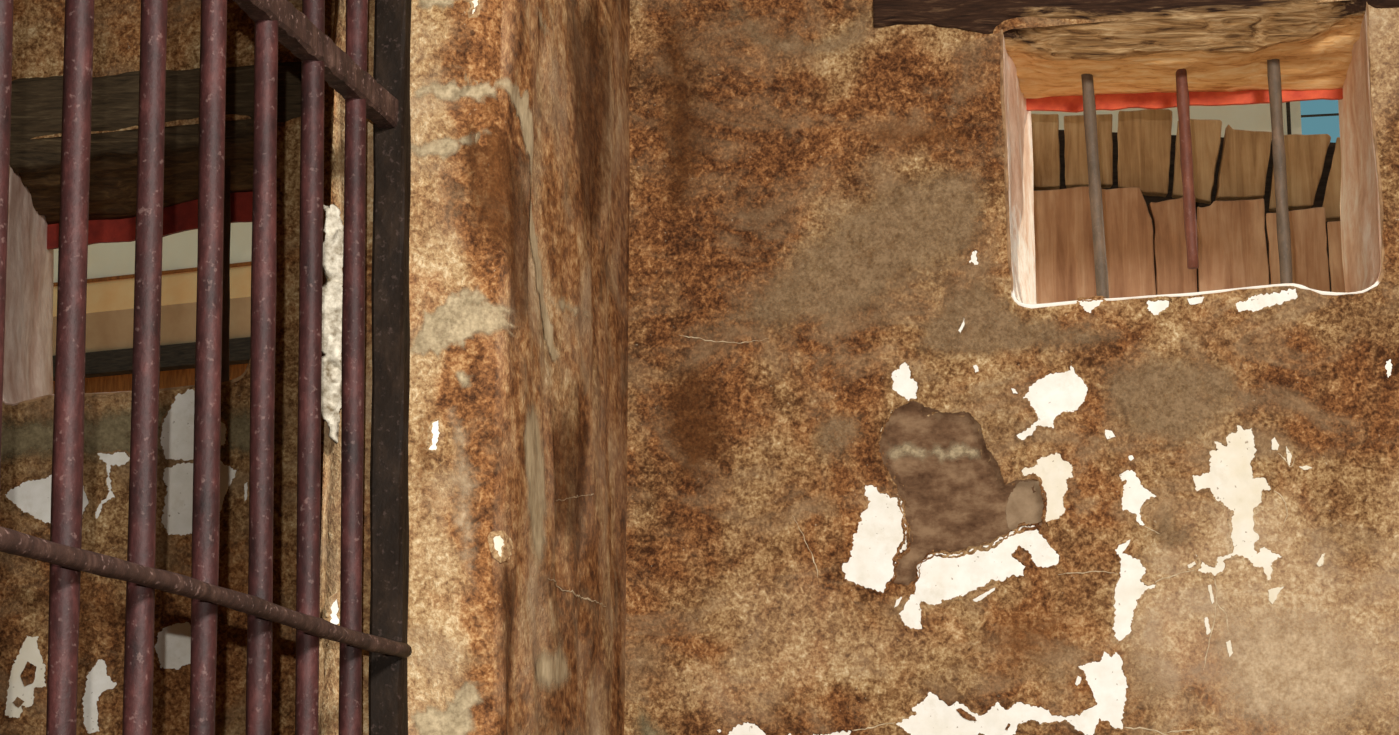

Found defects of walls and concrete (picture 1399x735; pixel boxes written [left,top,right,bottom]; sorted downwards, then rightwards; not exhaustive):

flaking render [966,246,982,269]
flaking render [3,470,52,529]
flaking render [82,450,130,523]
flaking render [158,387,195,540]
flaking render [220,417,248,519]
spalling [838,358,1092,635]
flaking render [1187,422,1312,635]
flaking render [893,455,1161,735]
flaking render [2,632,48,723]
flaking render [79,655,120,735]
flaking render [717,717,771,735]
flaking render [788,727,853,735]